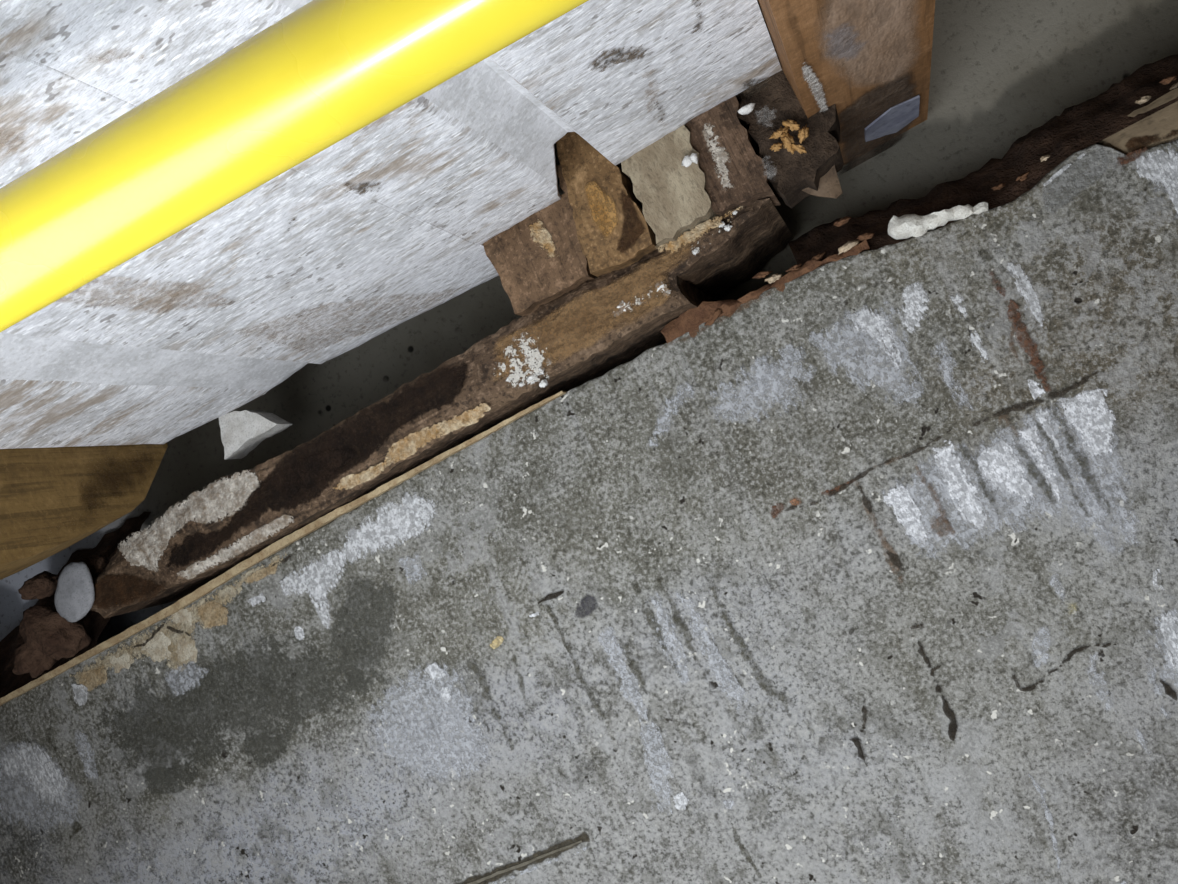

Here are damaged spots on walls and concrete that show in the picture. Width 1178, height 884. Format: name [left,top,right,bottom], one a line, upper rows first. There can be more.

rust [989,271,1050,392]
crack [785,372,1098,511]
damp [101,493,514,794]
damp [547,606,606,719]
damp [598,630,689,812]
damp [633,580,747,709]
damp [710,587,787,704]
crack [910,624,958,741]
crack [1011,642,1117,691]